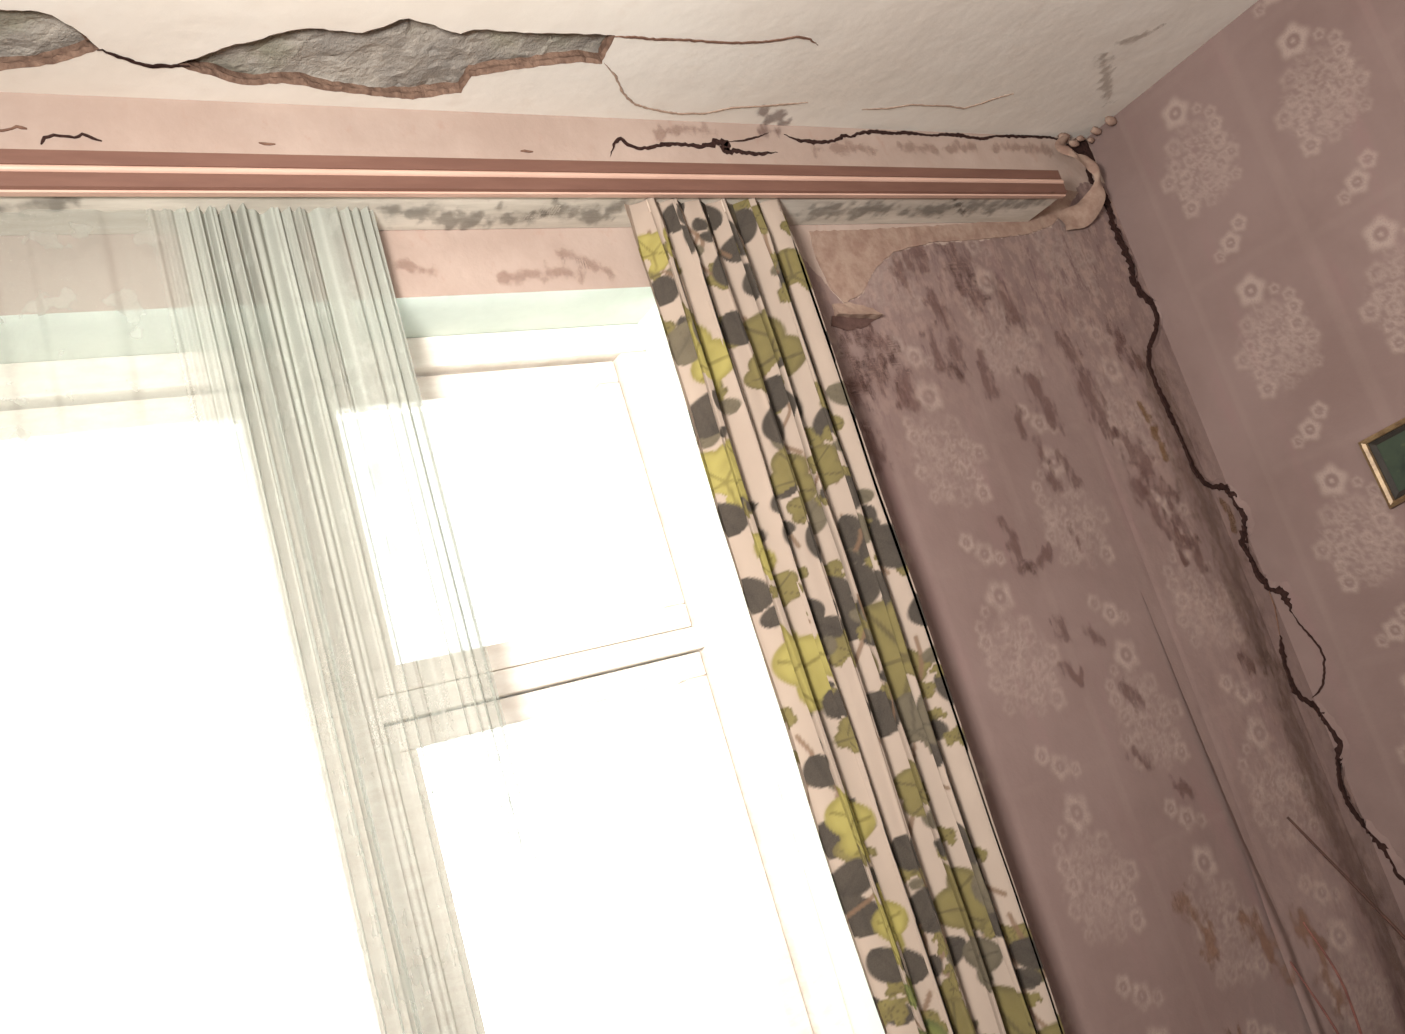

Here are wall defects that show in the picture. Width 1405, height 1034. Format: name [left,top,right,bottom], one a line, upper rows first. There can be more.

spalling [0,10,99,71]
spalling [178,18,615,100]
crack [604,36,1405,885]